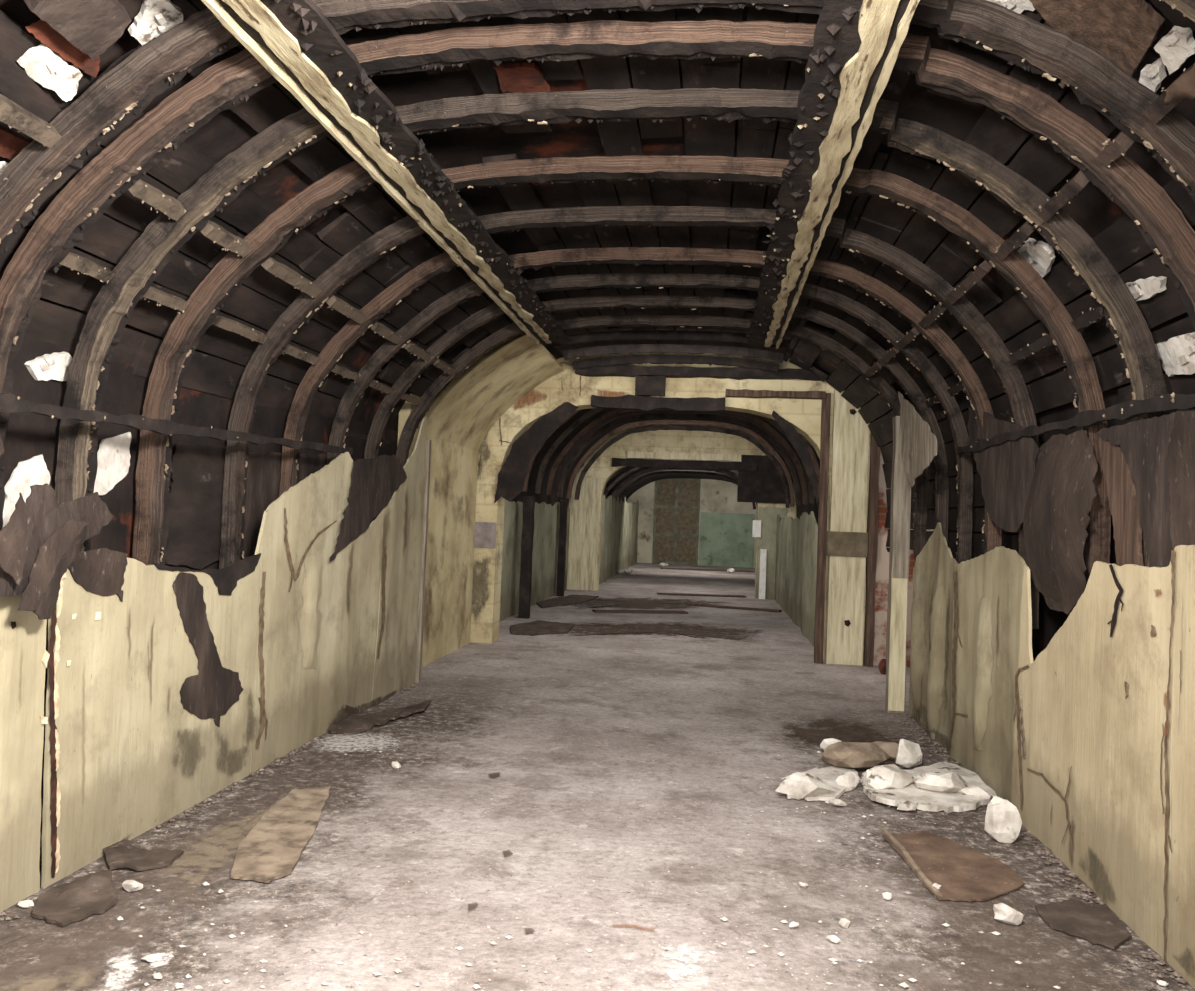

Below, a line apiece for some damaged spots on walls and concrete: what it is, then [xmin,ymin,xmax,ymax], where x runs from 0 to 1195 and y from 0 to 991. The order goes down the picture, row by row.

flaking render [17,44,83,102]
flaking render [1139,26,1195,93]
flaking render [3,455,51,528]
flaking render [94,432,132,495]
spalling [68,548,128,602]
crack [1107,564,1123,637]
spalling [153,553,261,727]